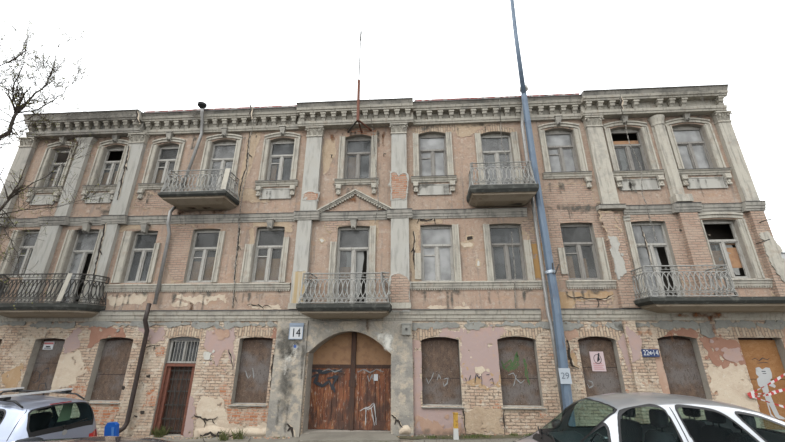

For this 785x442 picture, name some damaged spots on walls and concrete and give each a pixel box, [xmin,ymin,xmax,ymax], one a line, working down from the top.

flaking render [388,171,409,201]
peeling [107,293,147,307]
flaking render [251,269,307,310]
flaking render [388,219,443,312]
peeling [559,290,614,310]
flaking render [520,183,694,285]
peeling [736,212,785,296]
peeling [0,321,277,426]
peeling [183,381,269,437]
peeling [412,324,544,435]
peeling [563,320,785,428]